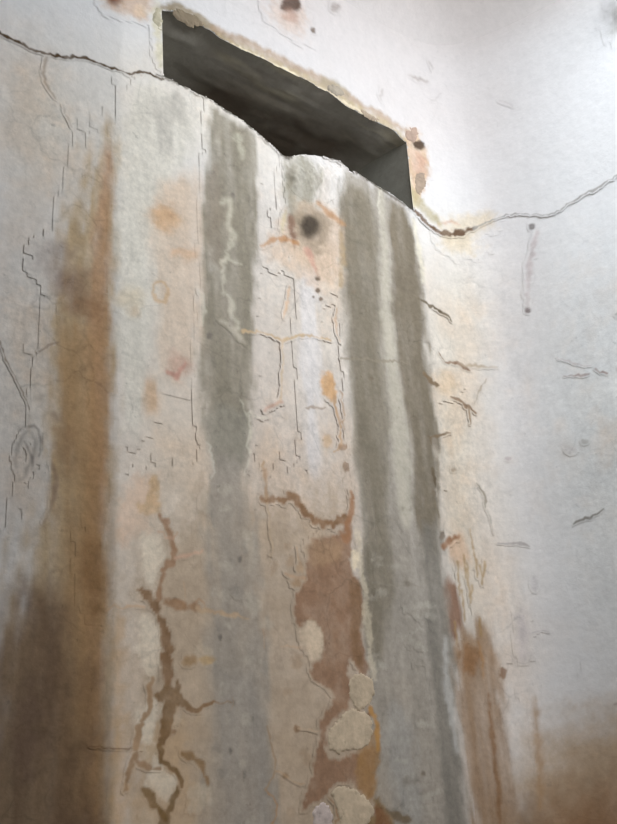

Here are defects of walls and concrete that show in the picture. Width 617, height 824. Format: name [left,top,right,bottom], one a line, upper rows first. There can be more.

rust [94,0,164,28]
crack [0,29,293,161]
peeling [195,192,249,348]
spalling [149,0,446,230]
crack [323,156,617,264]
damp [0,68,476,824]
peeling [239,398,414,824]
rust [439,525,551,824]